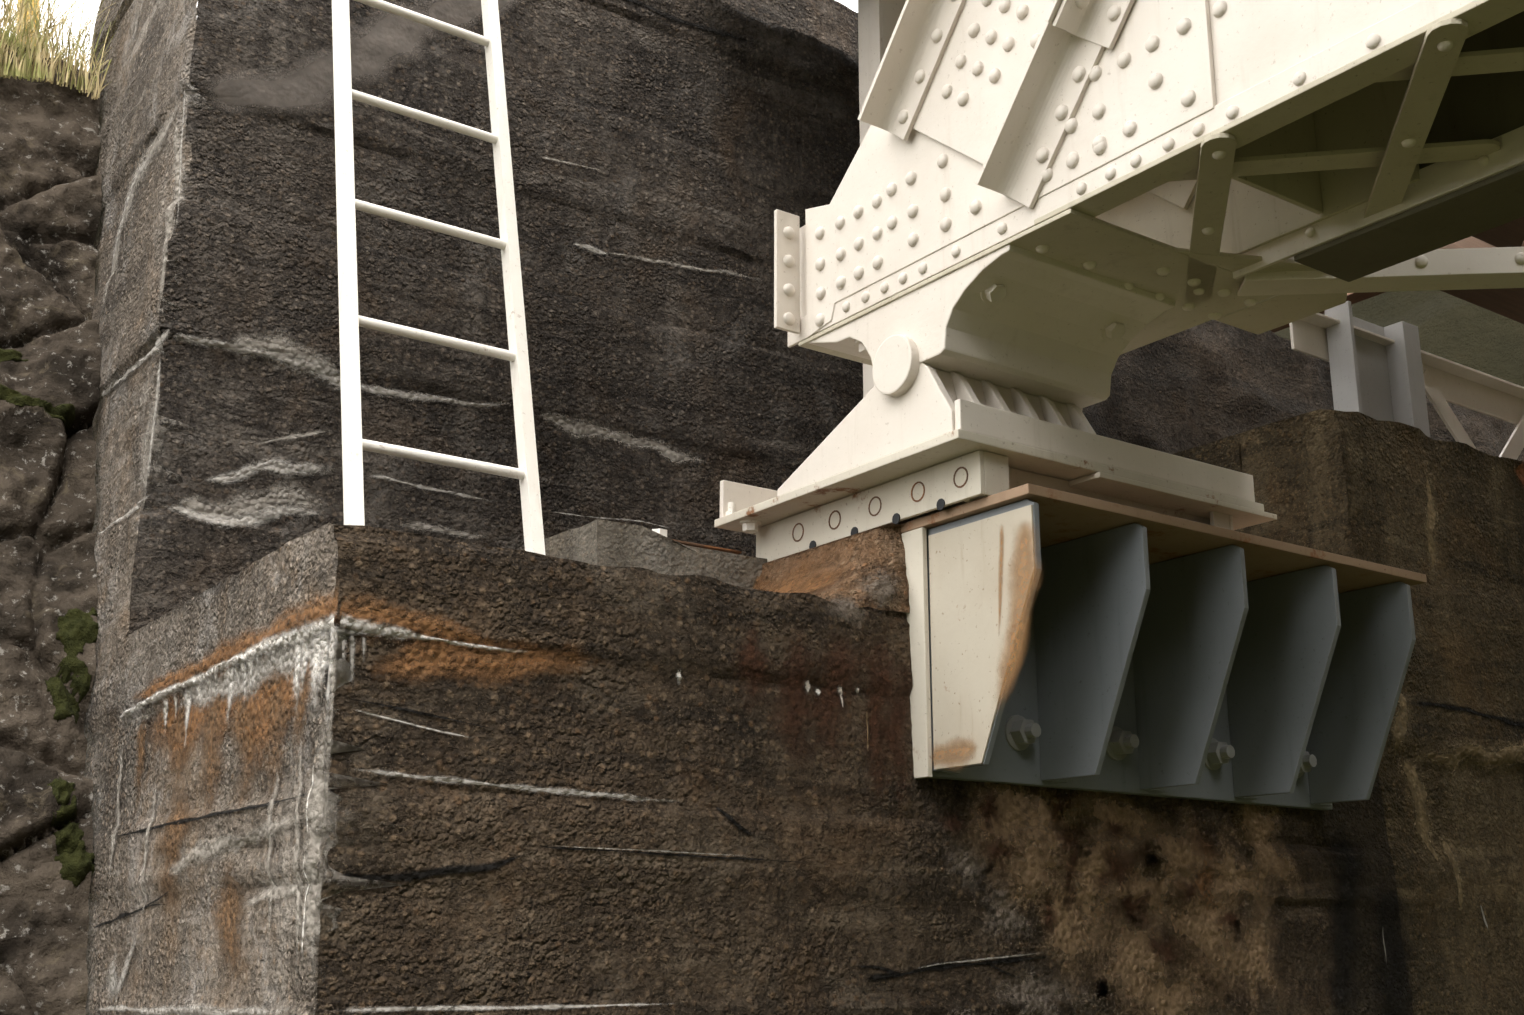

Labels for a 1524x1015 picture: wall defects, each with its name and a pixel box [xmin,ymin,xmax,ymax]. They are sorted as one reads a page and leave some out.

rust [758,566,834,593]
rust [137,597,572,796]
crack [1415,702,1524,728]
damp [110,750,122,868]
rust [163,804,188,890]
damp [121,615,650,948]
damp [578,847,724,855]